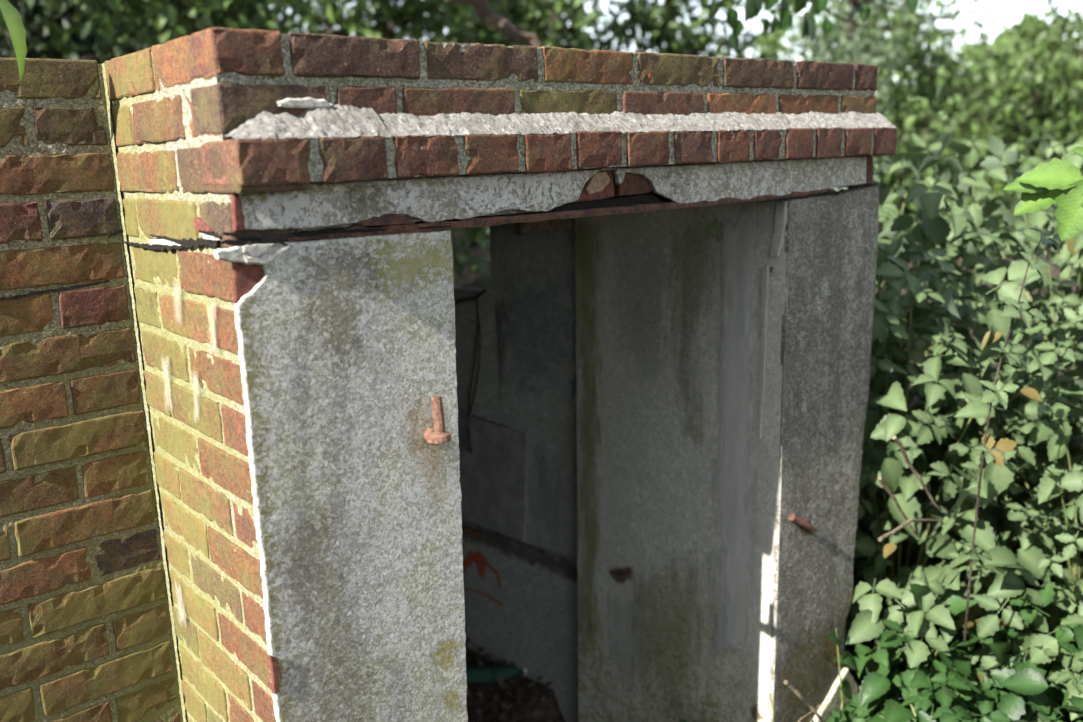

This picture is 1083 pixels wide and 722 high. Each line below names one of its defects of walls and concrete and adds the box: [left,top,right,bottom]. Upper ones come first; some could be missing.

spalling [455,169,664,216]
corrosion [343,214,416,230]
crack [415,223,452,231]
crack [108,223,389,257]
crack [0,280,110,301]